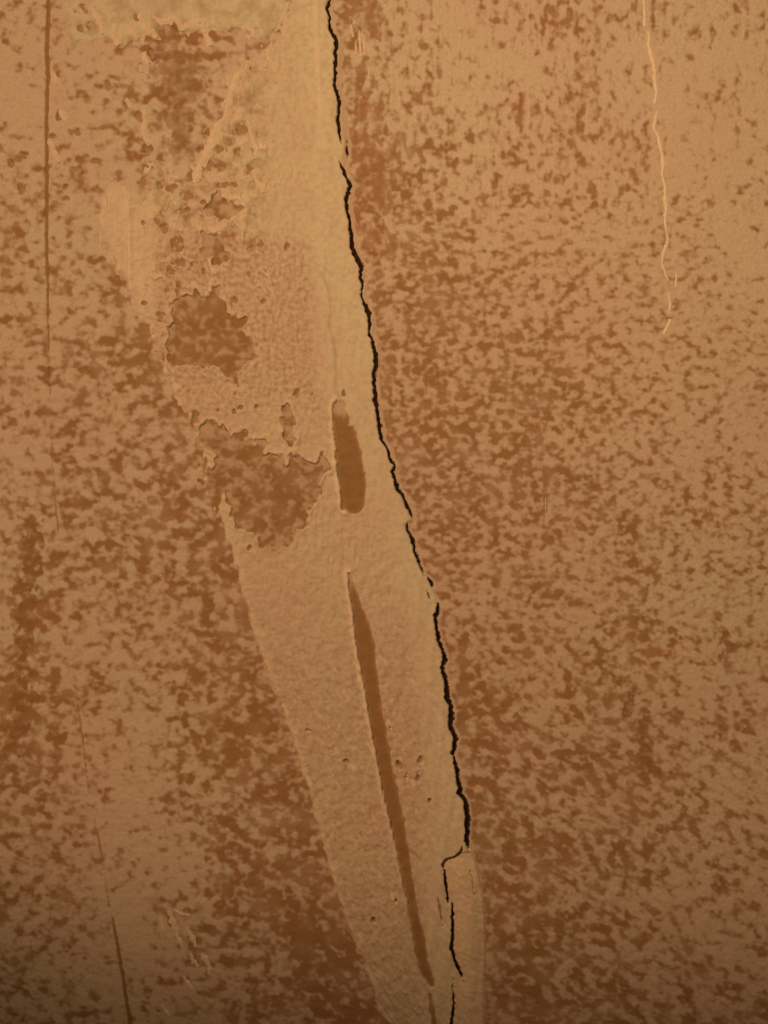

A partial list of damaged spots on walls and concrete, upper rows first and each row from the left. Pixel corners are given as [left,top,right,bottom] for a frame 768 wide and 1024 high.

peeling [137,146,253,221]
peeling [141,218,259,414]
peeling [191,388,366,551]
crack [326,0,471,1024]
crack [642,0,678,335]
hole [349,574,437,1024]